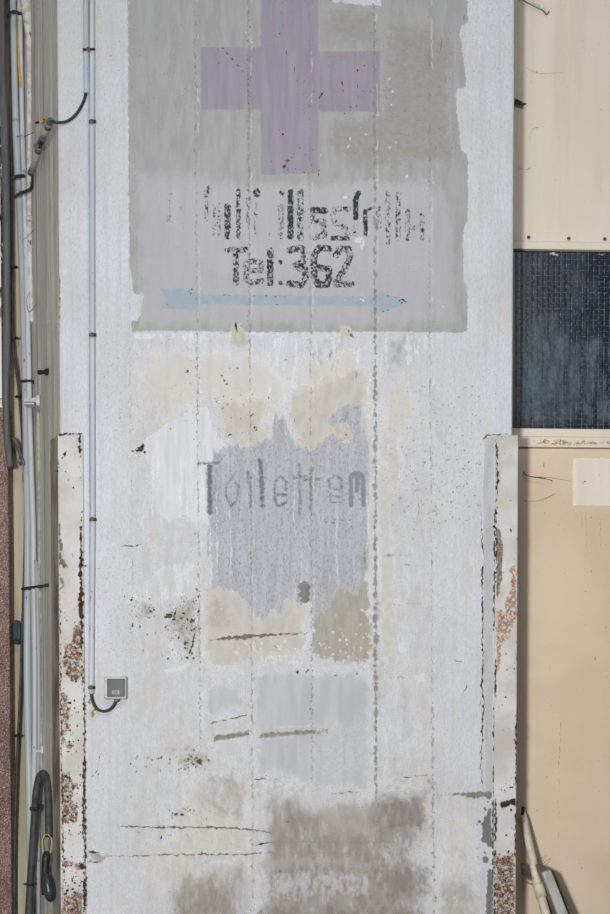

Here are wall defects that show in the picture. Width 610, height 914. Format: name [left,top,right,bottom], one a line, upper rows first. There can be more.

peeling [118,0,469,375]
flaking render [214,394,269,447]
flaking render [286,369,395,453]
corrosion [492,443,519,698]
corrosion [58,512,87,914]
flaking render [197,580,388,801]
corrosion [492,715,517,914]